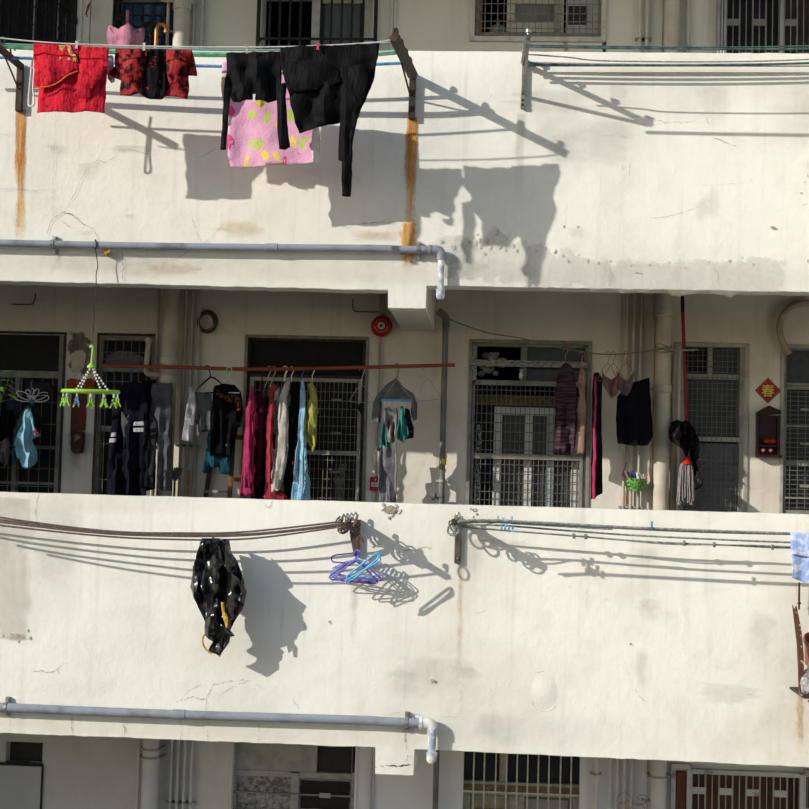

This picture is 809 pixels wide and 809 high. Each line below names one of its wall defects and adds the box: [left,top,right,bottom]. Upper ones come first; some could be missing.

rust [16,109,26,226]
crack [47,163,98,239]
rust [401,117,417,258]